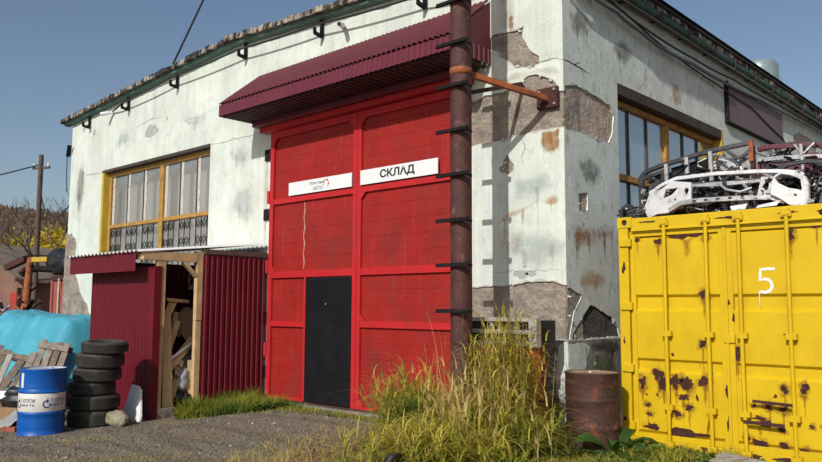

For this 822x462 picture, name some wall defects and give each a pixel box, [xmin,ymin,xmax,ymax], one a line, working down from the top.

crack [538,55,590,75]
peeling [472,26,614,147]
peeling [499,155,514,174]
peeling [472,265,618,424]
corrosion [638,340,710,451]
corrosion [751,384,789,421]
corrosion [743,428,791,462]